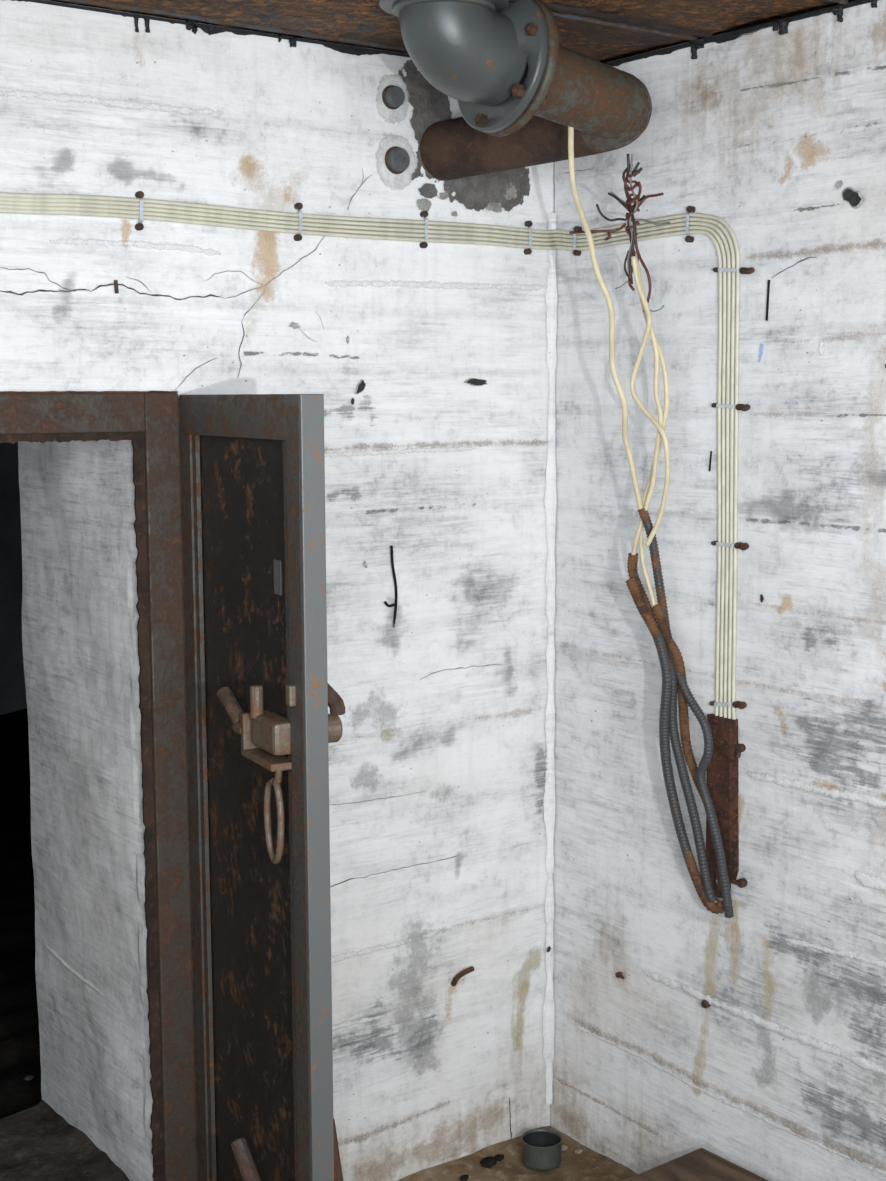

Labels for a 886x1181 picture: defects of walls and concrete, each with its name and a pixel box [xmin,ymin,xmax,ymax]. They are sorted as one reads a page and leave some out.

rust [253,227,278,297]
crack [0,236,325,388]
crack [331,855,460,887]
damp [513,955,539,1042]